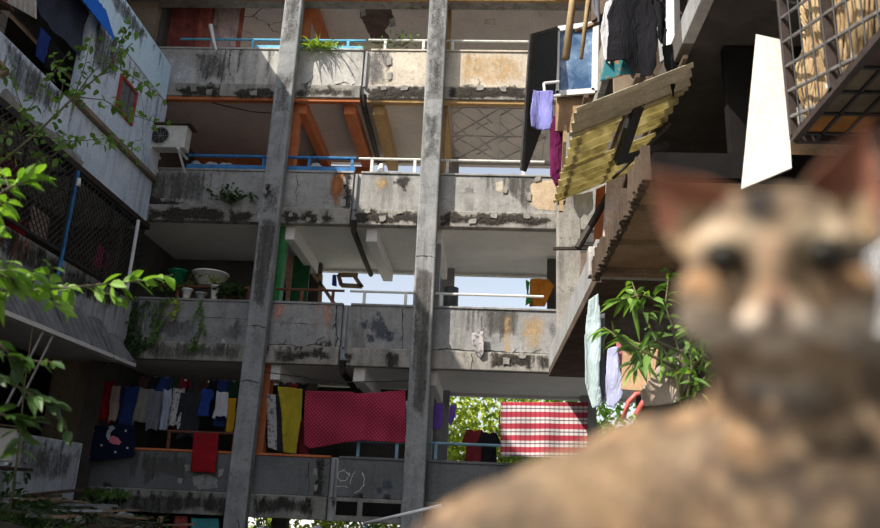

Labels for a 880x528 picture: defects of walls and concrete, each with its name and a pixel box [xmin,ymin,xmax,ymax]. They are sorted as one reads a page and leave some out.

damp [367,52,390,85]
peeling [360,9,427,101]
damp [295,85,352,98]
rust [331,174,343,205]
damp [468,309,518,350]
damp [254,496,312,515]